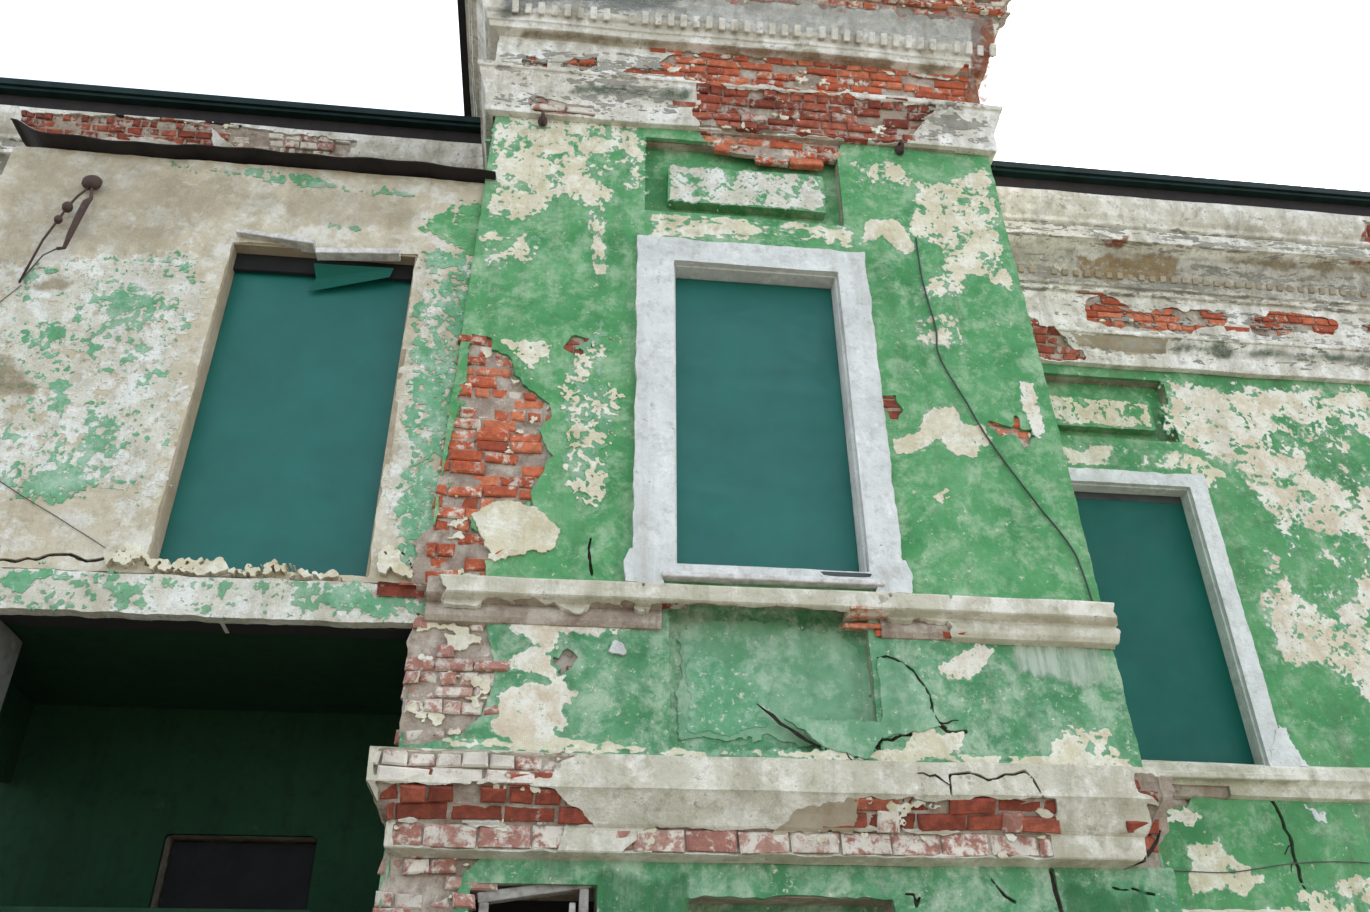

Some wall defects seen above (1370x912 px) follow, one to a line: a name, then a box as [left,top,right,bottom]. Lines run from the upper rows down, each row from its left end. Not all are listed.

flaking render [724,0,1005,21]
flaking render [493,47,1370,371]
peeling [0,110,1134,857]
crack [0,554,105,563]
peeling [1050,373,1370,713]
flaking render [373,852,498,912]
crack [757,656,966,760]
crack [918,771,1043,796]
flaking render [1126,779,1202,853]
flaking render [1184,835,1370,912]
crack [1271,801,1305,889]
flaking render [1270,725,1309,767]